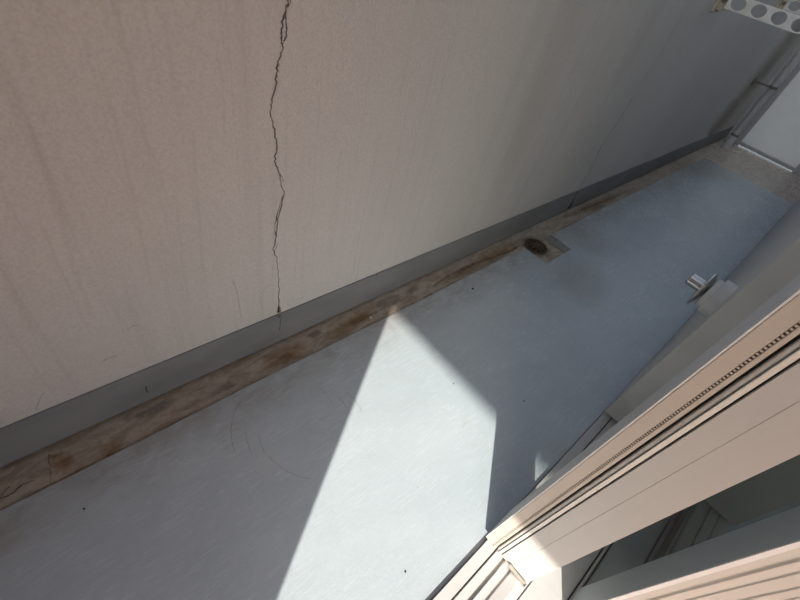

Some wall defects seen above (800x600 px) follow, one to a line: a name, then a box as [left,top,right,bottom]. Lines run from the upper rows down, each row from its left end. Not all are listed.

crack [270,0,291,329]